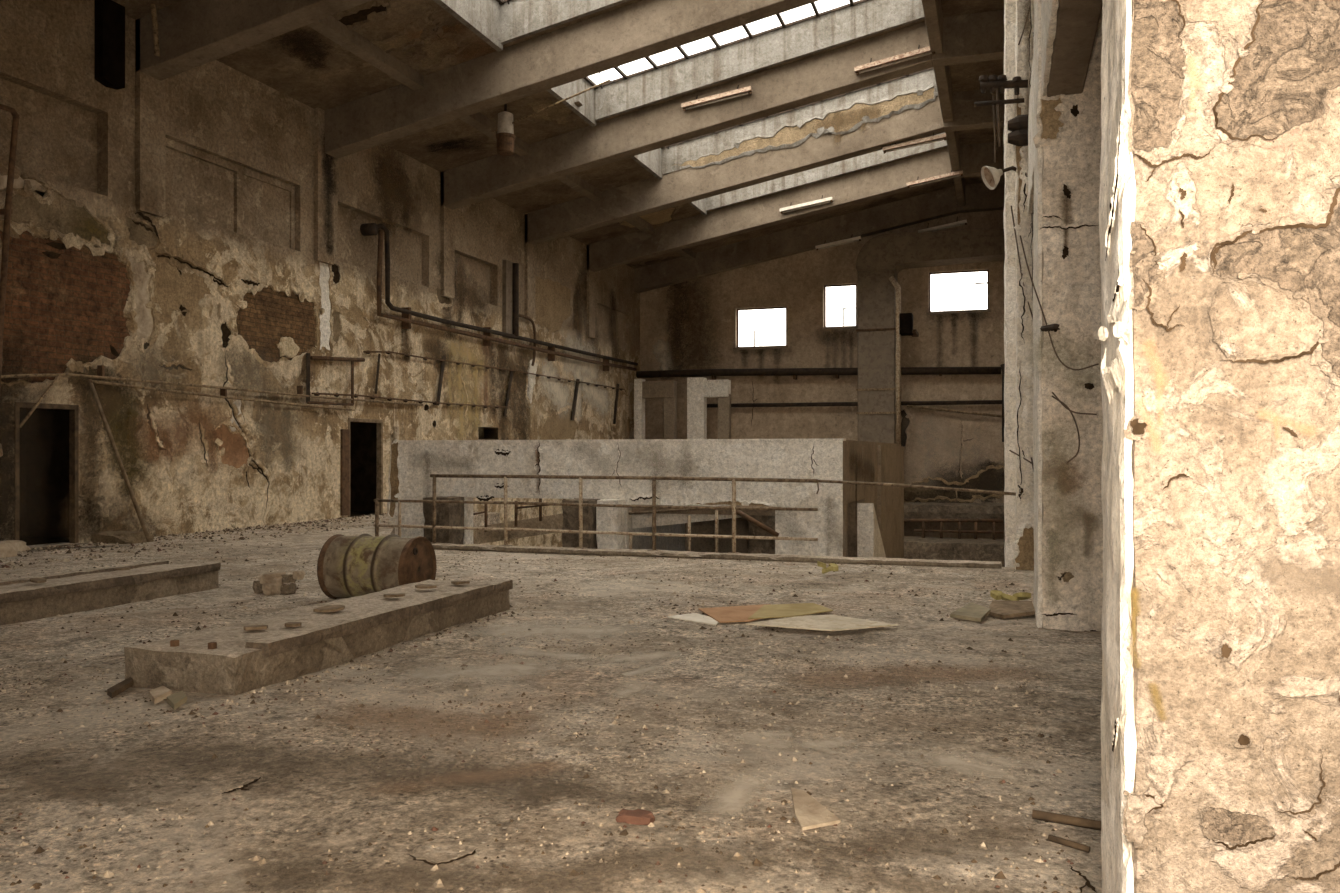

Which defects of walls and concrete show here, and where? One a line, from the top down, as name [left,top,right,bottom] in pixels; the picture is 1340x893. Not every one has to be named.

flaking render [1128,0,1340,161]
flaking render [0,158,214,393]
crack [147,245,230,287]
flaking render [228,262,371,370]
flaking render [1207,169,1340,386]
crack [1213,747,1329,849]
crack [1284,853,1340,880]